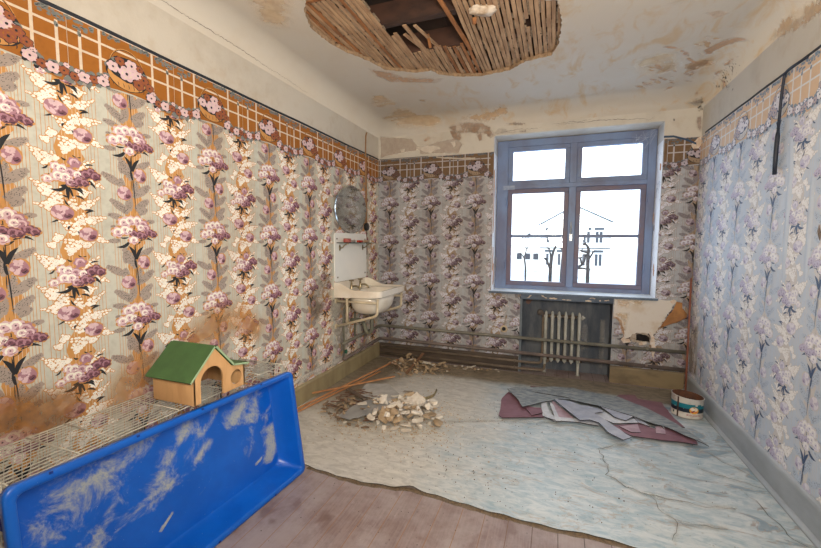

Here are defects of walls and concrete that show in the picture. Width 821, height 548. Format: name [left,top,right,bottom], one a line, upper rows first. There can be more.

flaking render [381,137,475,160]
spalling [630,333,650,345]
damp [0,391,80,436]